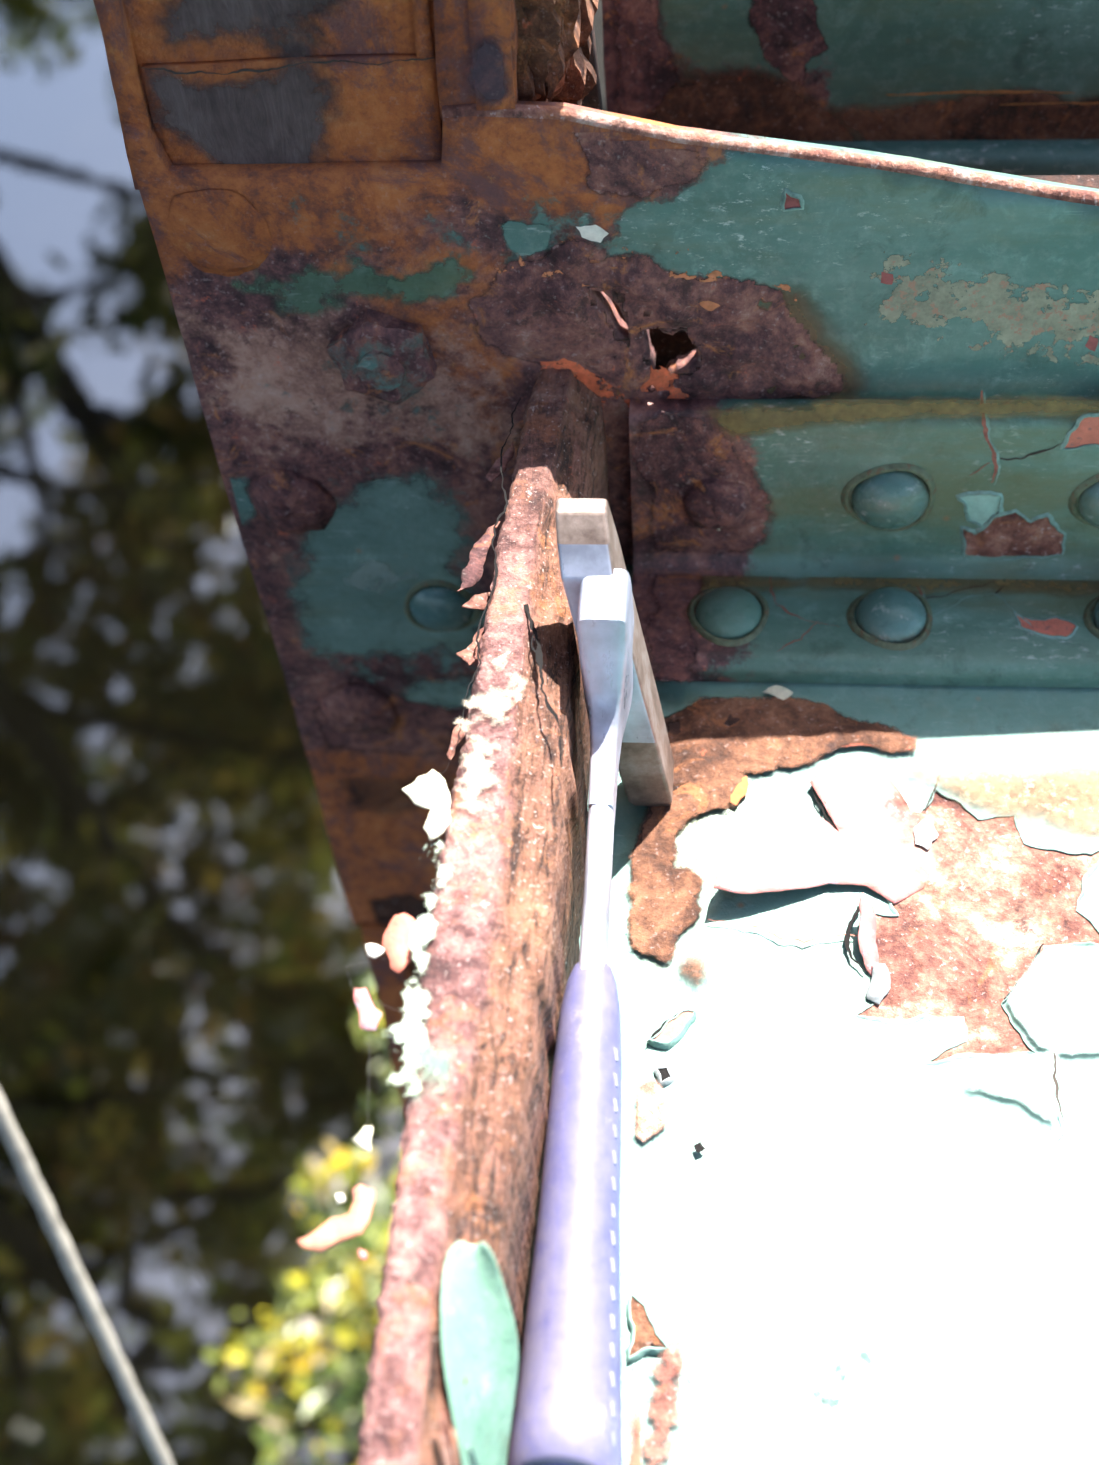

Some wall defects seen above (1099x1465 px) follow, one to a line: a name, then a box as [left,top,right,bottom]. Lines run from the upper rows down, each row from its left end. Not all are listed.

corrosion [614,0,1099,141]
corrosion [468,225,1099,553]
peeling [955,491,1066,562]
corrosion [456,521,500,666]
corrosion [314,676,469,761]
peeling [402,769,452,841]
corrosion [627,685,918,983]
peeling [366,913,416,974]
corrosion [370,894,429,923]
peeling [708,754,1099,1122]
peeling [354,988,382,1031]
peeling [352,1126,373,1152]